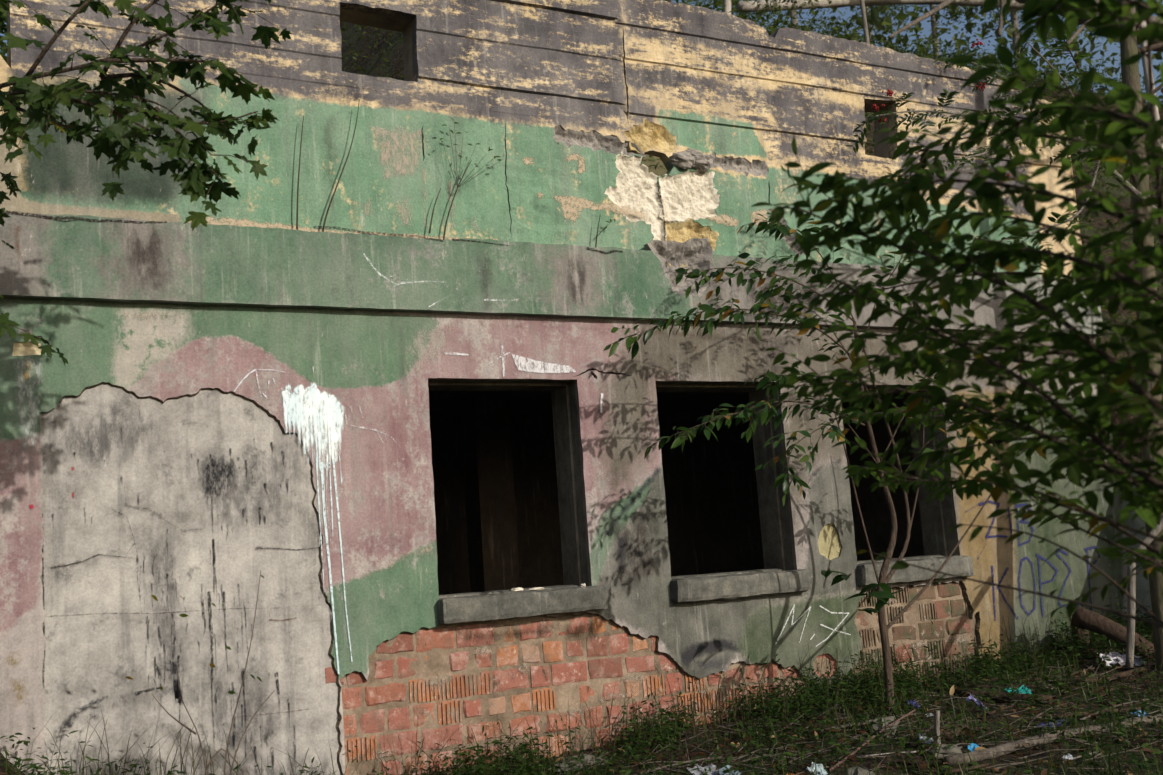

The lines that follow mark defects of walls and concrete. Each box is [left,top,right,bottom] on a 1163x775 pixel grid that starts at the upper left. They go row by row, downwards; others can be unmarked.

spalling [537,119,810,297]
damp [136,616,181,697]
damp [198,449,266,744]
spalling [38,382,836,775]
spalling [851,581,980,685]
damp [56,699,103,738]
damp [229,671,274,767]